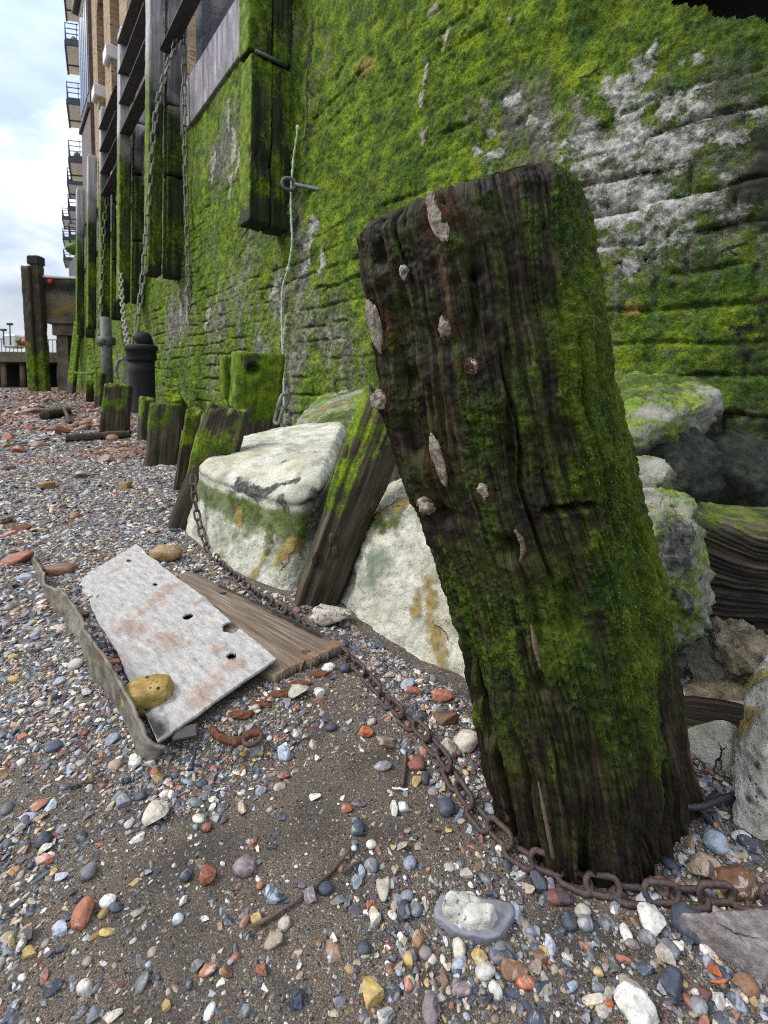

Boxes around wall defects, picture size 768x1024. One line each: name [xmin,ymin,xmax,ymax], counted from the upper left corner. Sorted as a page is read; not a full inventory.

water stain [726,126,768,203]
corrosion [252,536,304,580]
corrosion [410,576,447,670]